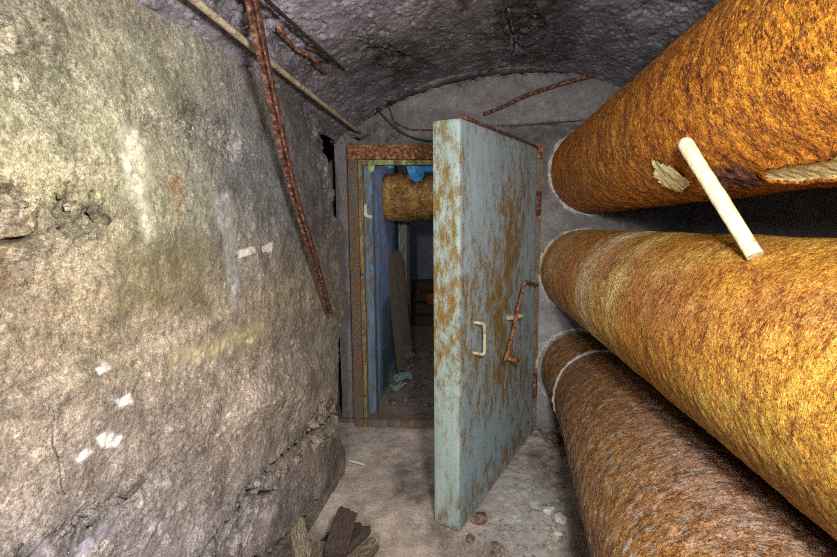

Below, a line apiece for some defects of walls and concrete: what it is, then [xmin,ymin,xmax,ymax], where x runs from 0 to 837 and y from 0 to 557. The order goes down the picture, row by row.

spalling [0,174,114,290]
spalling [0,474,146,557]
crack [213,412,345,557]